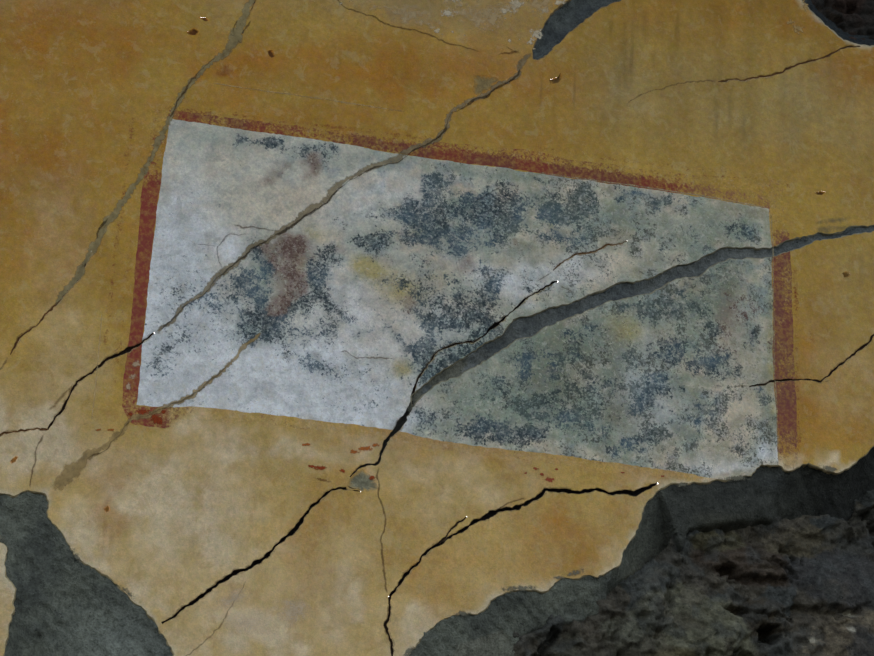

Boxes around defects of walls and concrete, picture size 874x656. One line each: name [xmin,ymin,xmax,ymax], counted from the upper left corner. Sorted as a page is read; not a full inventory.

crack [659,46,860,90]
flaking render [801,0,874,47]
crack [0,0,621,489]
flaking render [0,490,174,656]
spalling [346,469,377,492]
crack [161,221,874,656]
flaking render [404,446,874,656]